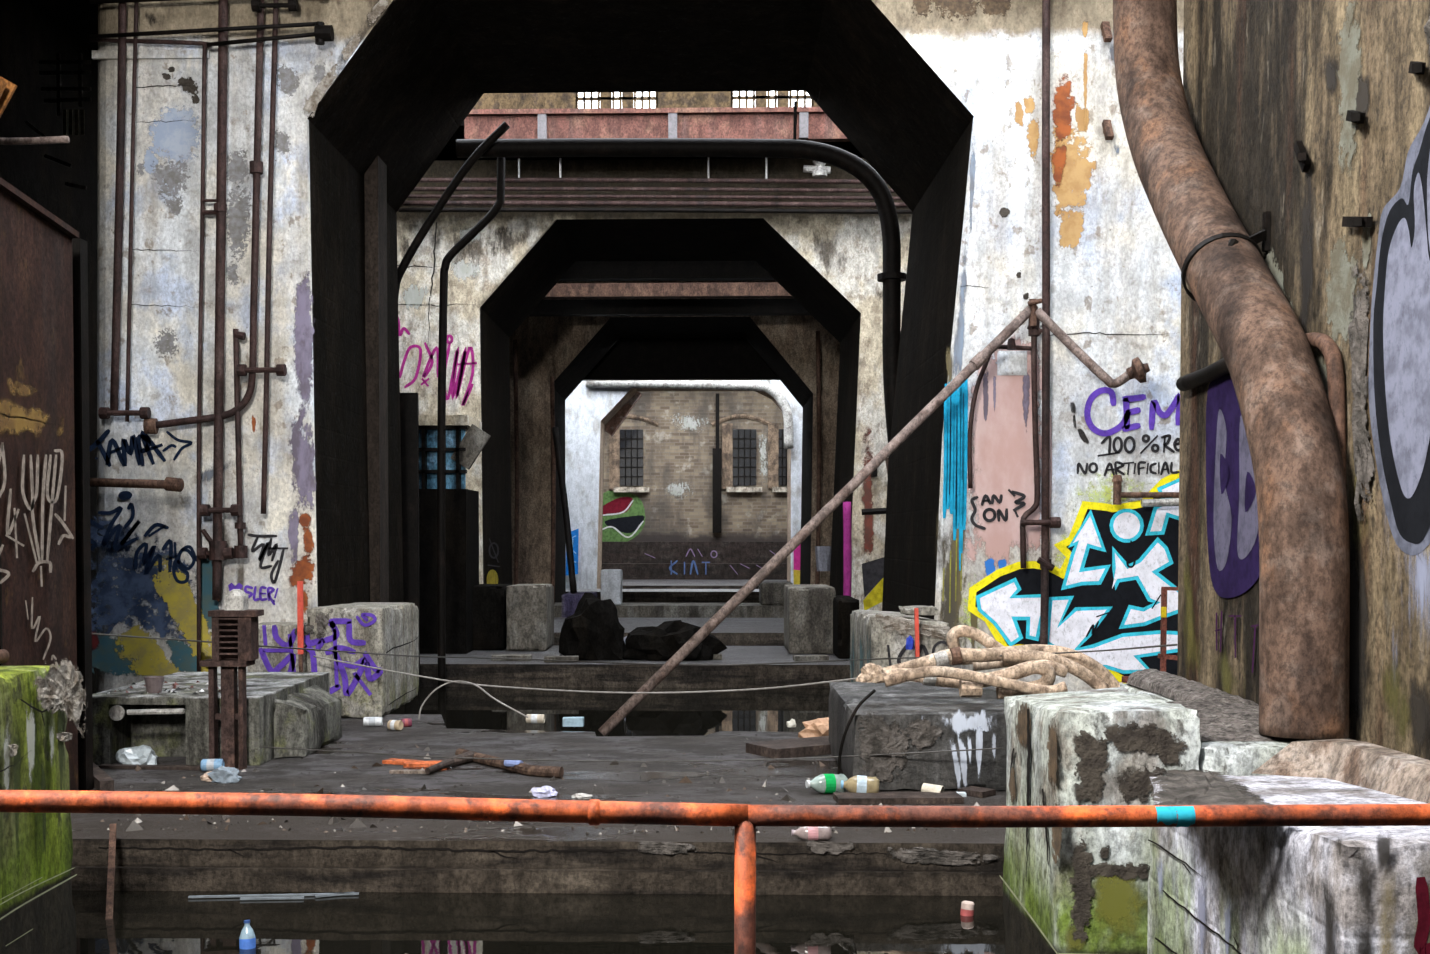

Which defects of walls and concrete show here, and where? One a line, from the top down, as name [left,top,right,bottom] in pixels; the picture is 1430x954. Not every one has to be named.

damp [1184,576,1198,663]
damp [1349,541,1369,724]
damp [4,711,64,790]
spalling [34,659,88,742]
damp [1386,672,1430,754]
damp [0,812,77,920]